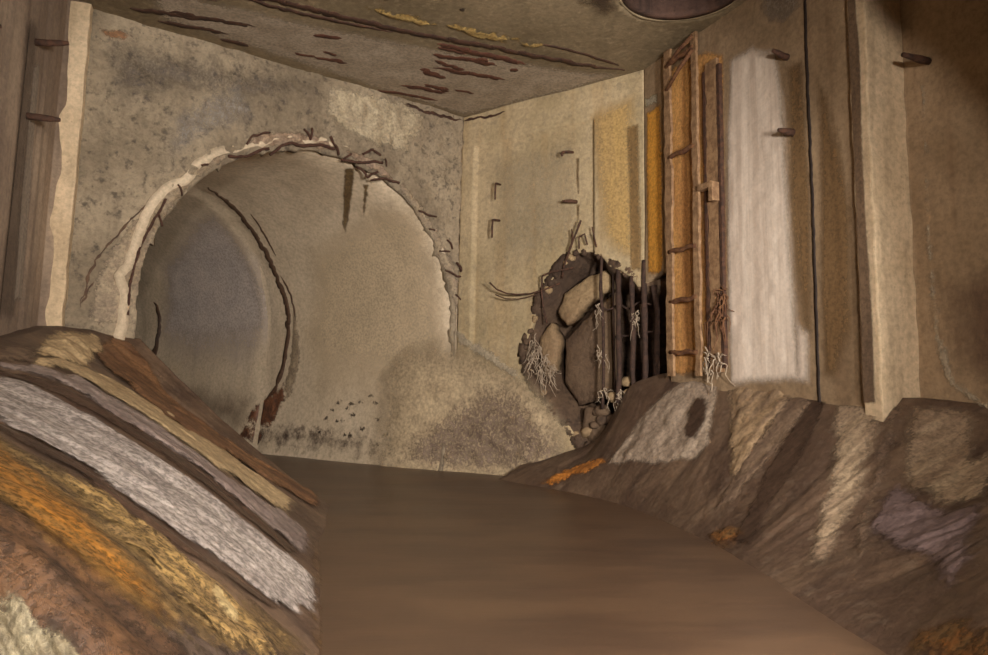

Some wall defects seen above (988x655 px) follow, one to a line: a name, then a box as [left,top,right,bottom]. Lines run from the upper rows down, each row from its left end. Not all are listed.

crack [207,187,291,398]
water stain [285,316,300,396]
flaking render [90,43,526,324]
water stain [277,427,360,451]
spalling [489,220,667,449]
corrosion [595,53,723,374]